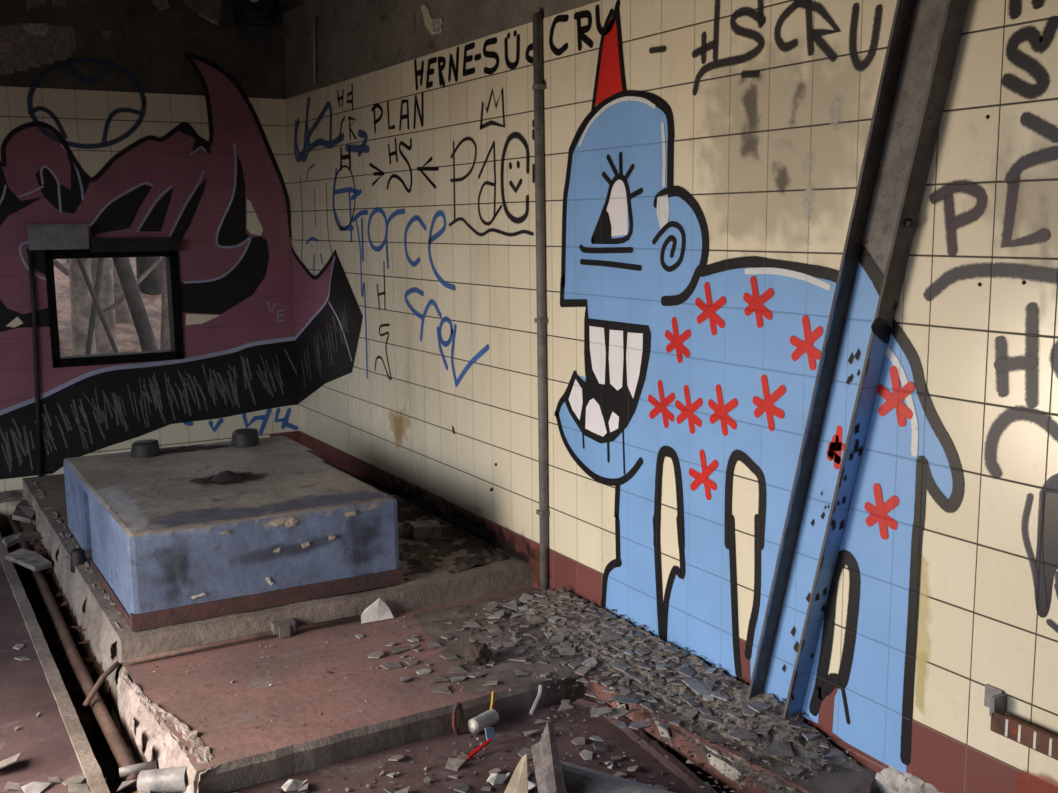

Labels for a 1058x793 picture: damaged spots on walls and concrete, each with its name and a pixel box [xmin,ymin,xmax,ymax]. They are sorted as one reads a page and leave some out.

peeling [0,0,76,75]
spalling [22,479,217,793]